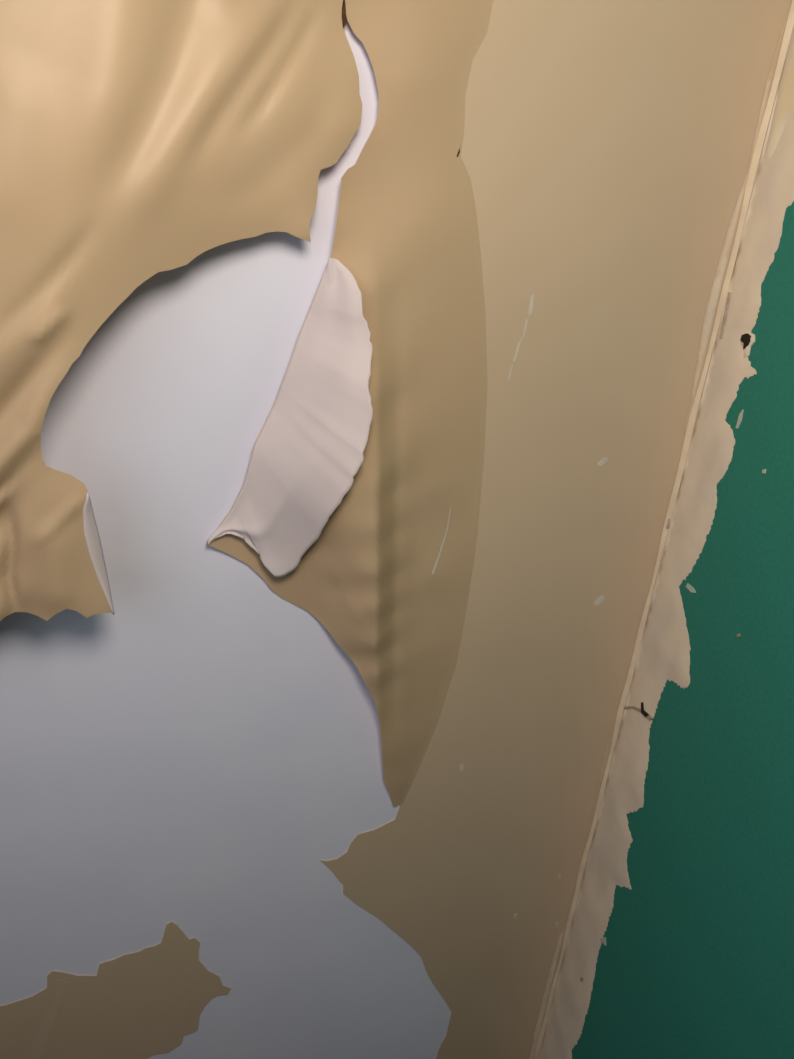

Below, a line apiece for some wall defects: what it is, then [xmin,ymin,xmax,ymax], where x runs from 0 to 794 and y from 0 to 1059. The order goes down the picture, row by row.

peeling [0,0,451,1059]